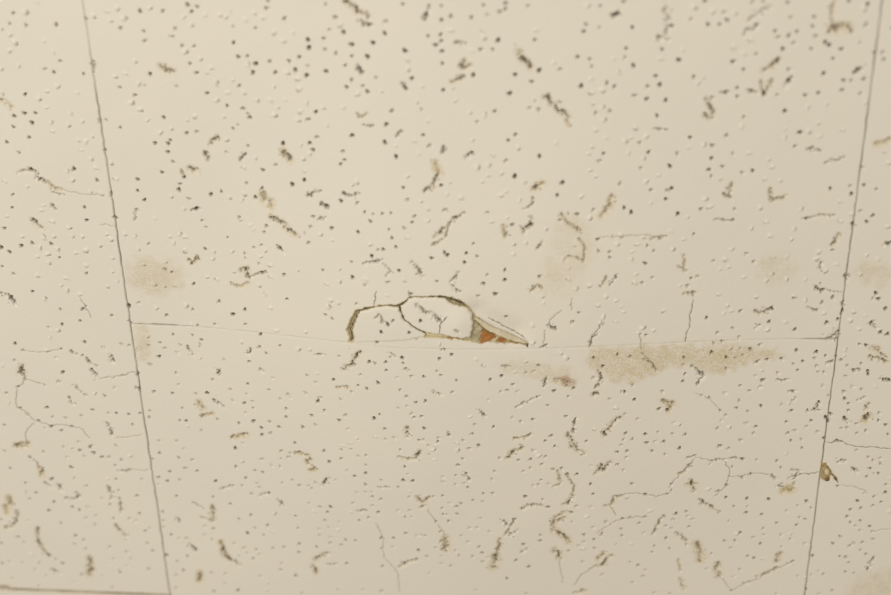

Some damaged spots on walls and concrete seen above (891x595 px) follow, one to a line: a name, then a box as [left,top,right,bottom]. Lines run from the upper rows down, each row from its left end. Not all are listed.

spalling [353,296,474,350]